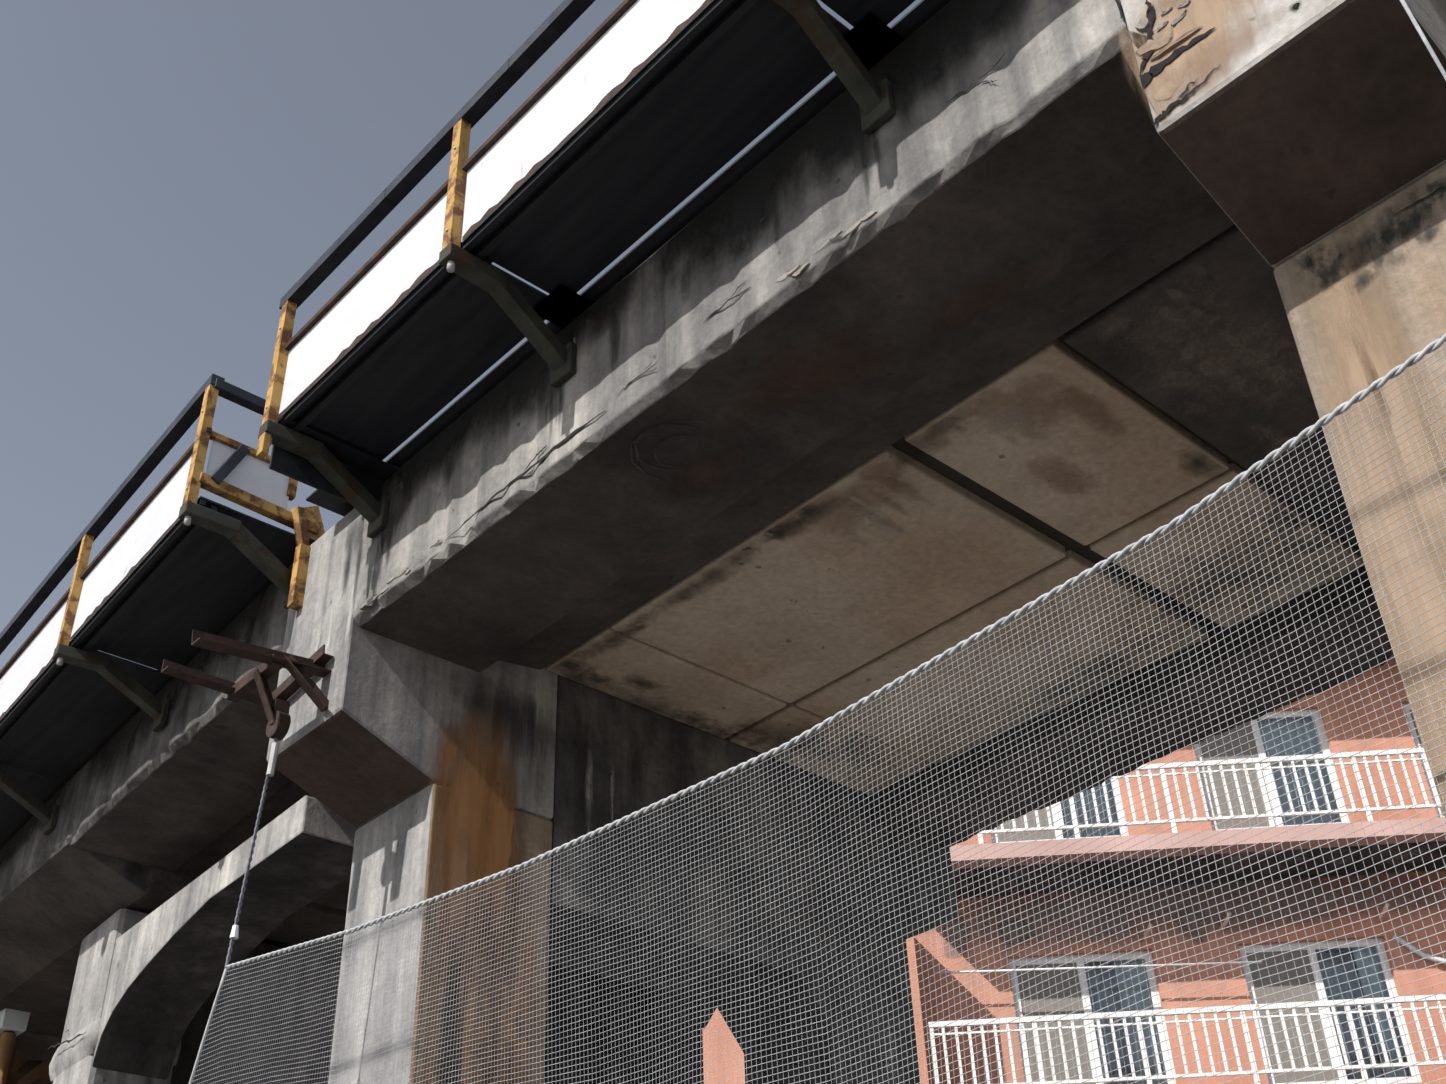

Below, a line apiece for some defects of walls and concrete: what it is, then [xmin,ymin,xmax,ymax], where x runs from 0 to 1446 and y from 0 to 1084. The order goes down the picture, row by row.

crack [947,55,1003,102]
spalling [1130,0,1245,115]
damp [1304,181,1446,285]
crack [1393,185,1446,216]
corrosion [416,715,533,1084]